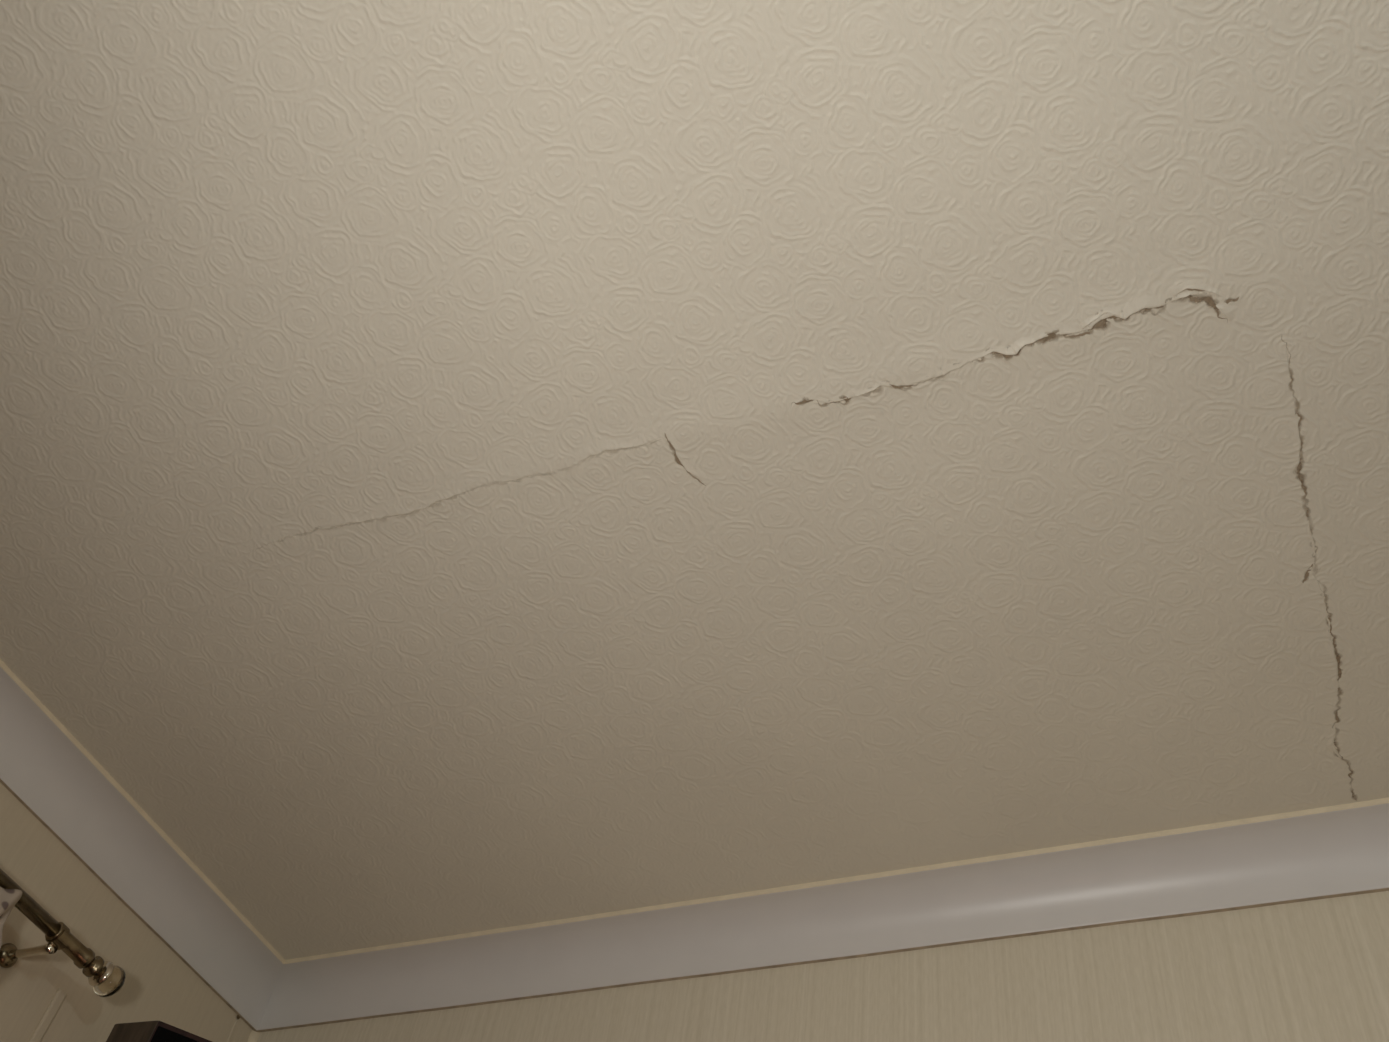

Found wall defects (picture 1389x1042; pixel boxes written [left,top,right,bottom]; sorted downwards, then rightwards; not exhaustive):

crack [787,281,1242,405]
crack [1277,334,1355,803]